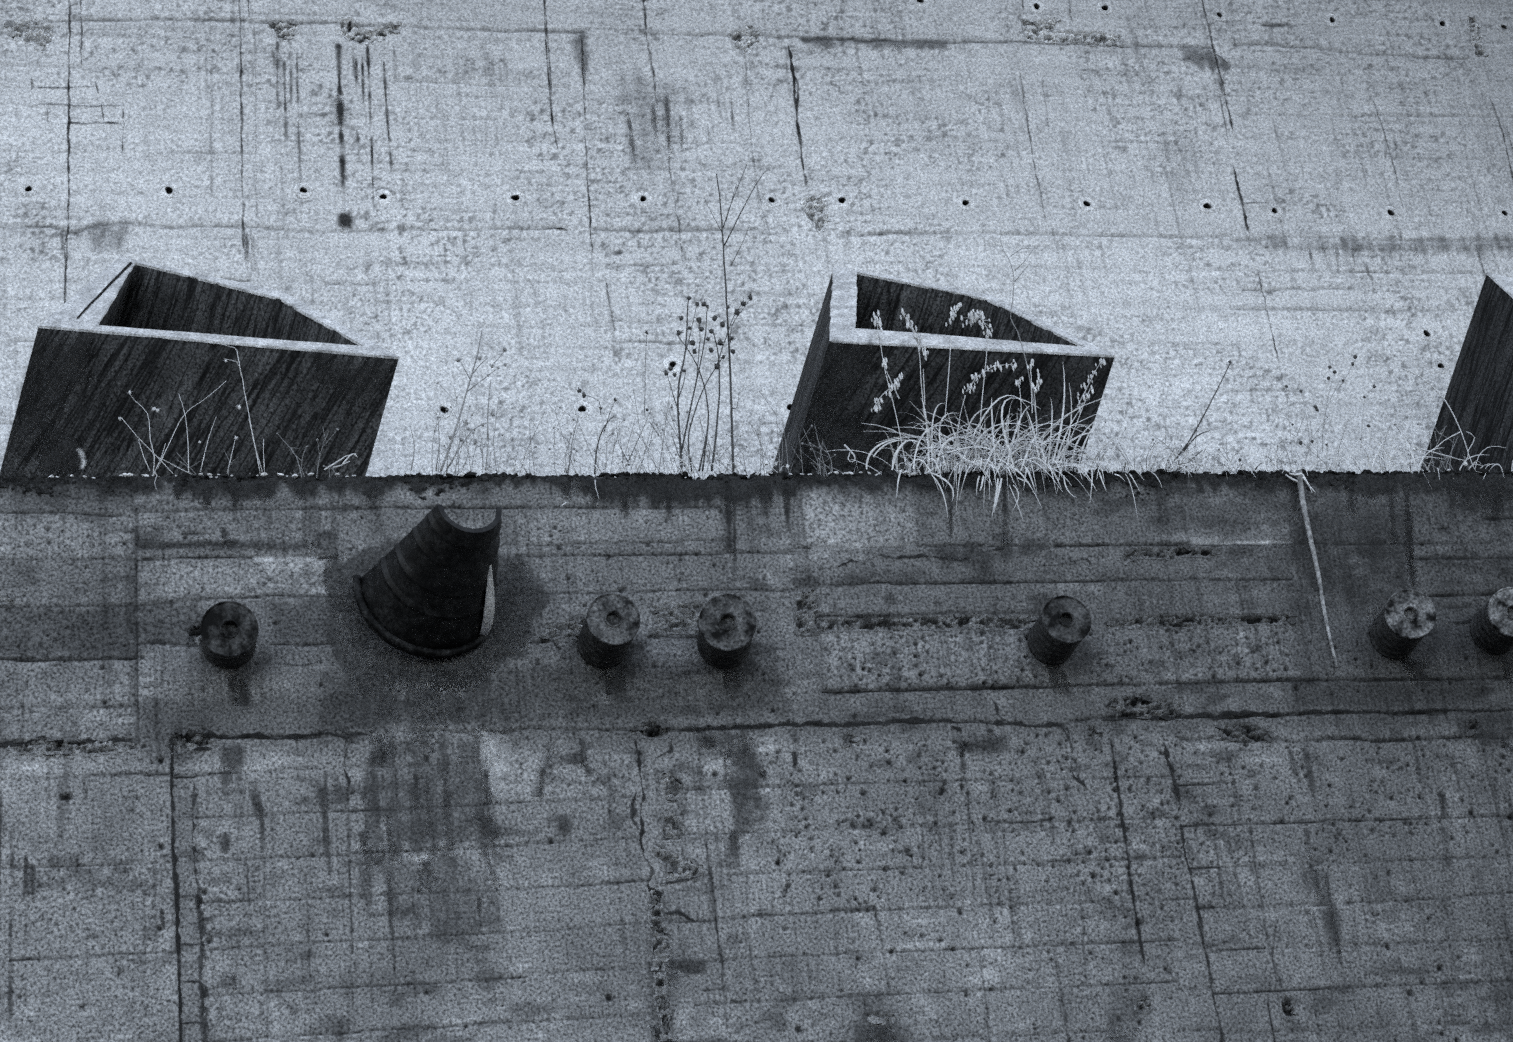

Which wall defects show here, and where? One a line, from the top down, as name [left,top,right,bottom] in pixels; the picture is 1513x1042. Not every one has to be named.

spalling [336,17,404,44]
spalling [1022,16,1124,47]
damp [272,41,300,160]
damp [336,43,395,186]
damp [338,213,353,229]
damp [324,539,549,725]
damp [572,741,591,774]
damp [251,791,264,841]
damp [318,788,328,846]
damp [360,739,497,932]